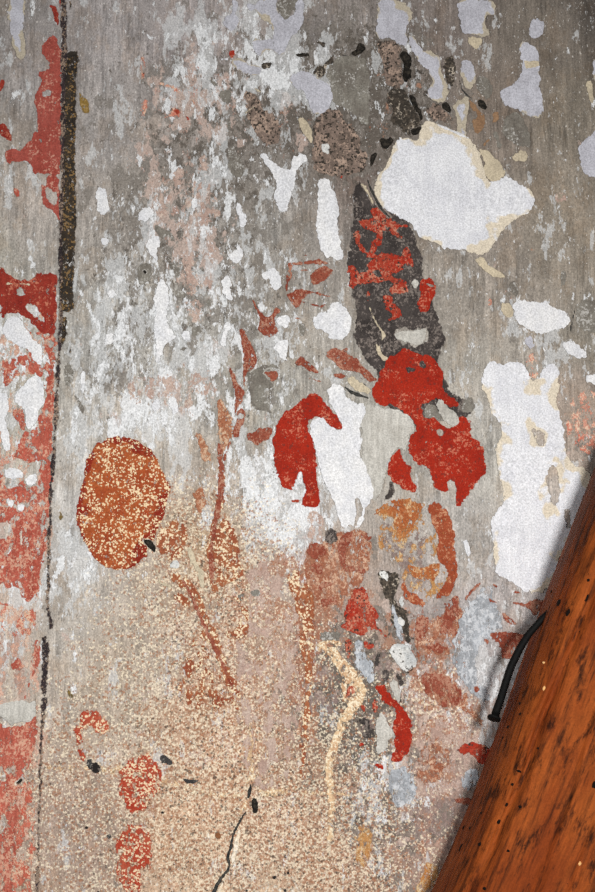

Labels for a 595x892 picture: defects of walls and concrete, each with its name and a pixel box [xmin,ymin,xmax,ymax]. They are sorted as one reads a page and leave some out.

peeling [221,0,304,75]
flaking render [290,43,394,177]
peeling [376,0,487,135]
peeling [457,0,496,37]
peeling [500,18,544,118]
peeling [395,329,426,345]
peeling [0,267,85,892]
crack [212,784,252,892]